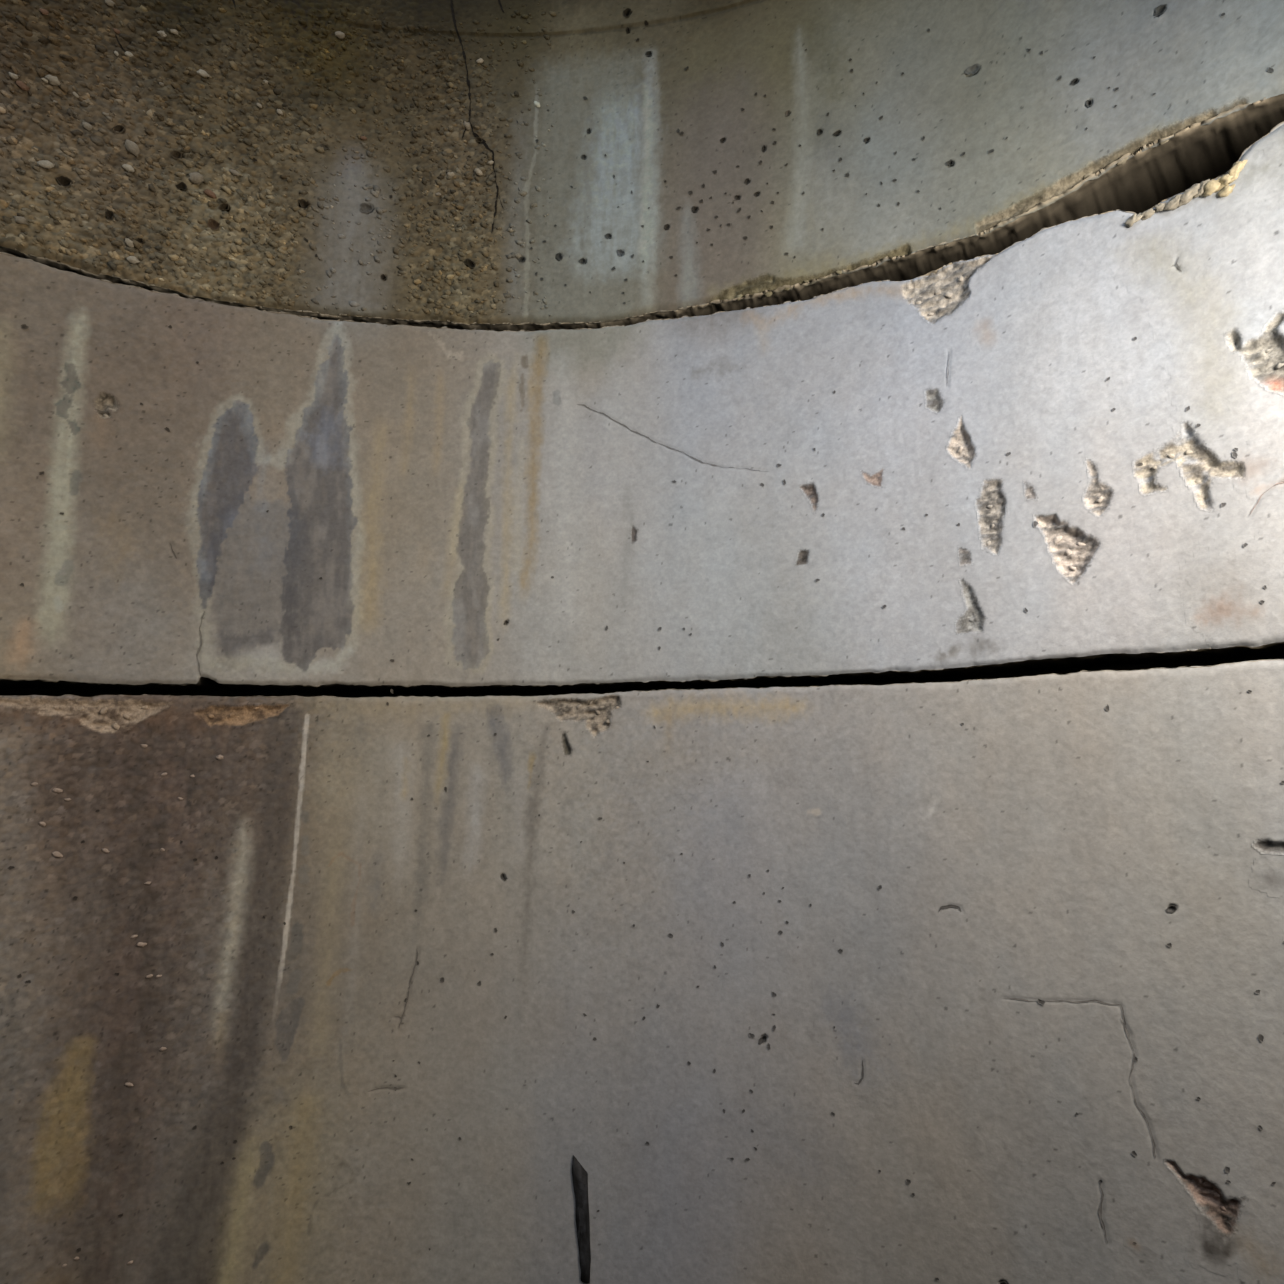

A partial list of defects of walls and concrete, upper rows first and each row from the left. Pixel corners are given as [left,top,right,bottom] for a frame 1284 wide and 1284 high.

crack [451,0,504,233]
water stain [179,131,410,684]
water stain [426,37,877,677]
crack [578,404,767,472]
spalling [900,253,1000,325]
spalling [1023,479,1102,585]
spalling [1132,406,1247,512]
spalling [1223,308,1284,397]
crack [196,611,205,676]
water stain [269,716,312,1064]
water stain [0,726,261,1284]
crack [1004,997,1156,1158]